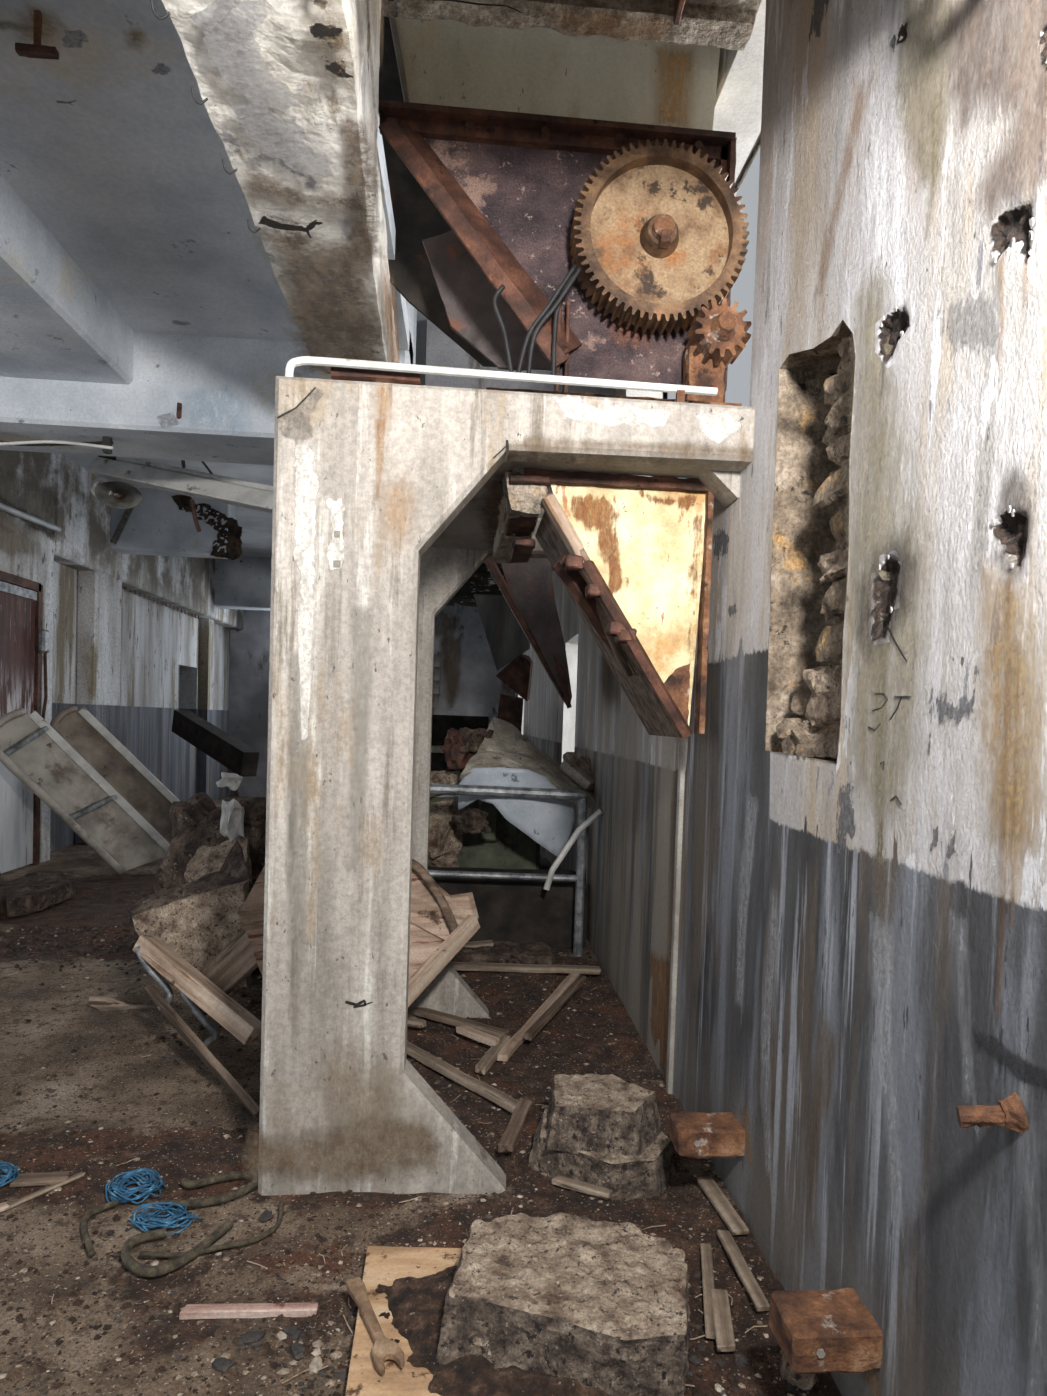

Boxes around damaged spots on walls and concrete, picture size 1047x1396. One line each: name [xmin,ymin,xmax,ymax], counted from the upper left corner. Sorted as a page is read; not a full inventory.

damp [898,0,1047,211]
damp [250,118,384,375]
spalling [991,204,1035,270]
spalling [878,307,909,376]
rust [571,495,629,595]
rust [639,490,702,531]
spalling [991,473,1028,573]
spalling [860,547,911,663]
rust [663,650,696,724]
rust [986,589,1033,843]